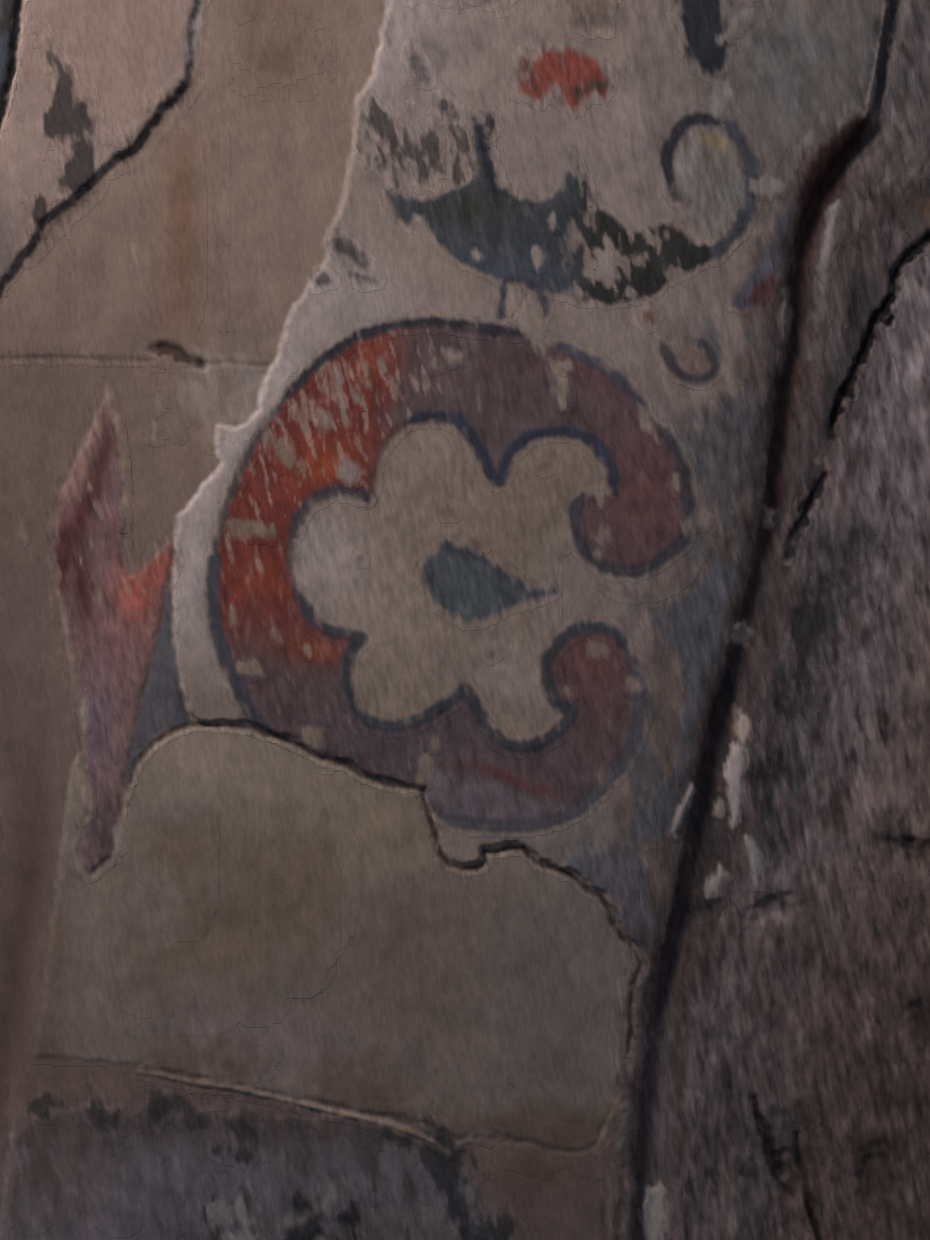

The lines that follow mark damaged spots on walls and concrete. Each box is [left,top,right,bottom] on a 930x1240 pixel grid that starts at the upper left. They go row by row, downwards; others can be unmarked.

peeling [711,1,756,52]
crack [0,0,32,149]
peeling [705,71,736,124]
peeling [342,81,488,206]
peeling [467,241,488,267]
peeling [498,206,576,414]
peeling [260,347,395,476]
crack [779,238,930,566]
peeling [332,449,369,494]
peeling [231,654,270,683]
peeling [295,720,338,775]
peeling [406,728,449,798]